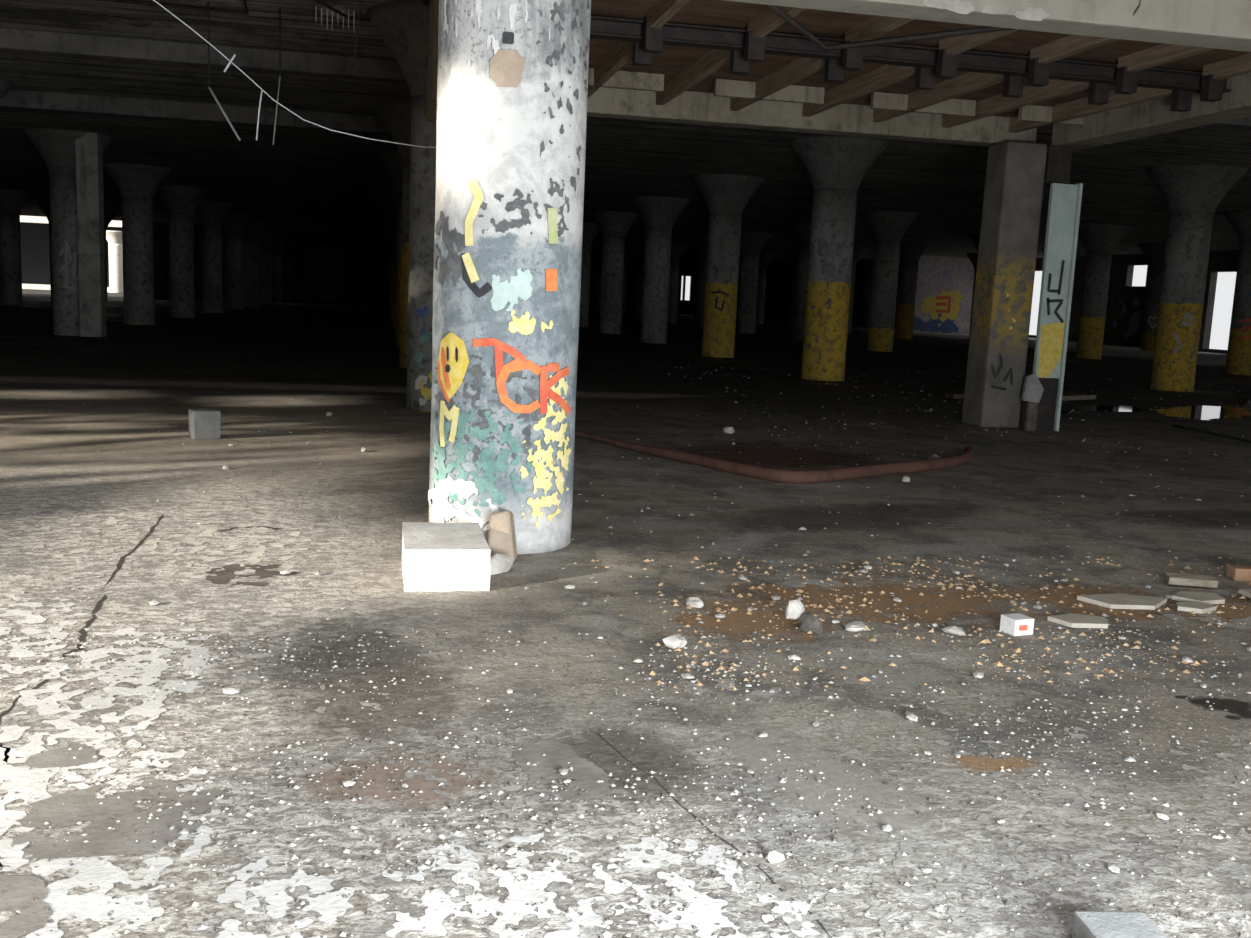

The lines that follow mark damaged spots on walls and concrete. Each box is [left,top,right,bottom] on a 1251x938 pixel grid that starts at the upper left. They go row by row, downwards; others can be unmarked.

spalling [444,0,590,157]
peeling [479,146,581,237]
peeling [433,211,466,286]
peeling [413,268,572,529]
crack [0,515,163,761]
peeling [359,693,391,710]
spalling [681,673,782,700]
spalling [386,718,611,815]
peeling [370,823,983,938]